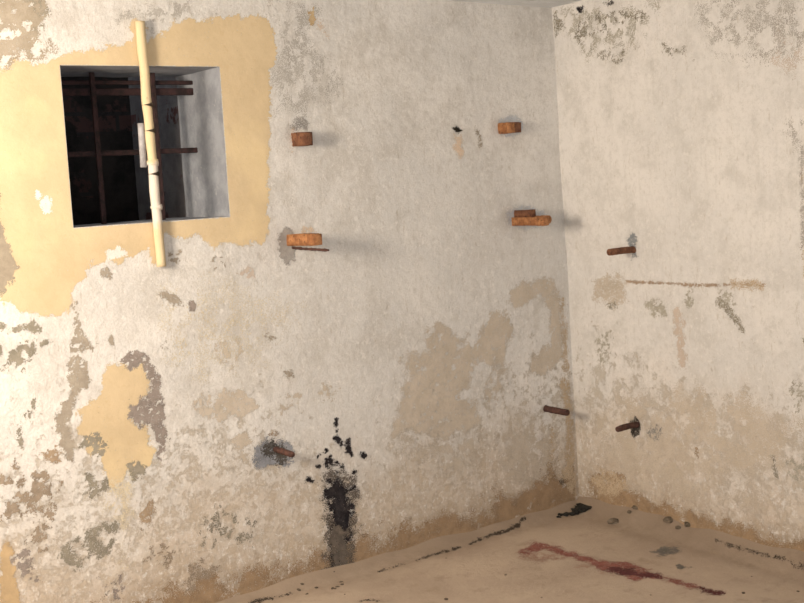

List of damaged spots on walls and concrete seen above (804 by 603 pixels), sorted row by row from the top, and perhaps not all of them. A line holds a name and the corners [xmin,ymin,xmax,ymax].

peeling [0,14,329,603]
leakage [111,379,804,603]
corrosion [545,297,576,497]